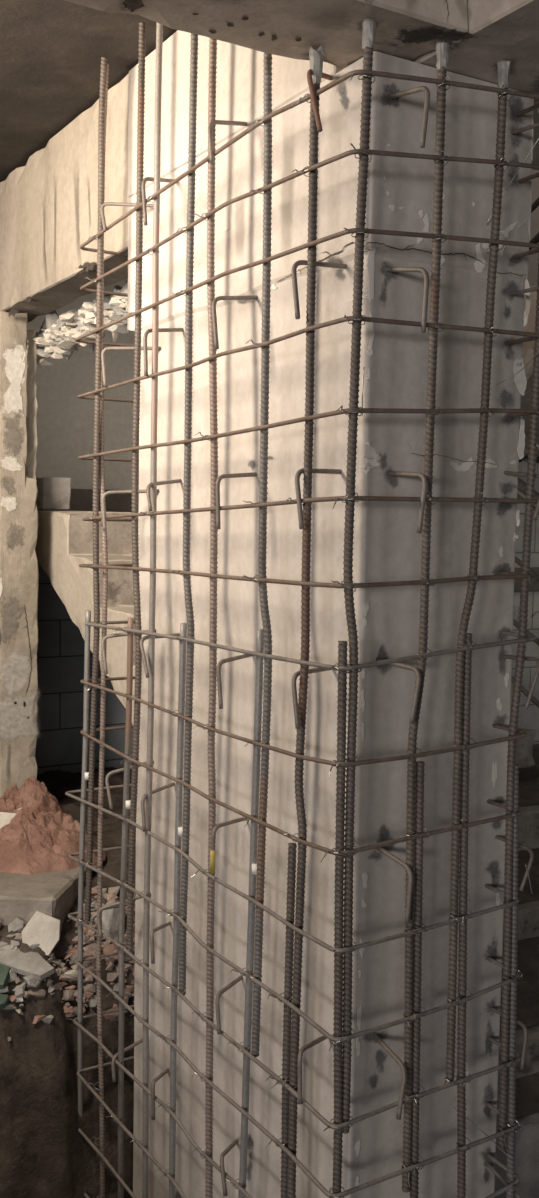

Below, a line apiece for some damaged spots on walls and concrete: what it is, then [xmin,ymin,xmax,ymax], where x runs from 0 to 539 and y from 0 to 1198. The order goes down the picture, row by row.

spalling [0,0,163,1198]
crack [277,242,522,282]
spalling [446,60,539,1198]